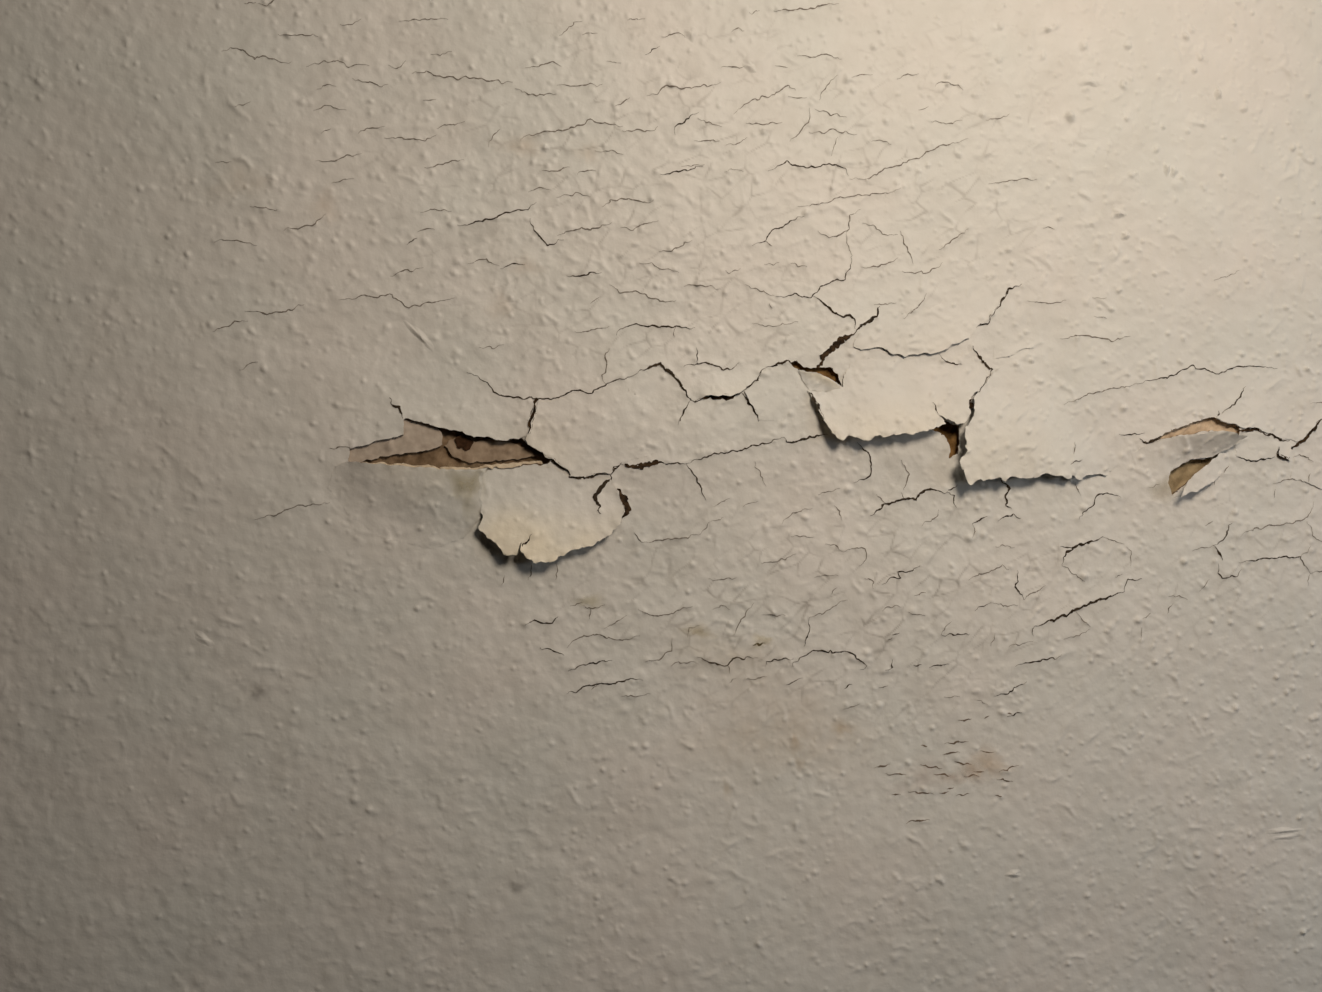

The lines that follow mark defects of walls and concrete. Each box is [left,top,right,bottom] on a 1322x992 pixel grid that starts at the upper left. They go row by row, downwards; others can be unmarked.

peeling [348,370,670,563]
crack [215,0,1009,543]
crack [529,442,1142,822]
peeling [676,273,1322,497]
crack [935,286,1129,424]
crack [1064,365,1322,637]